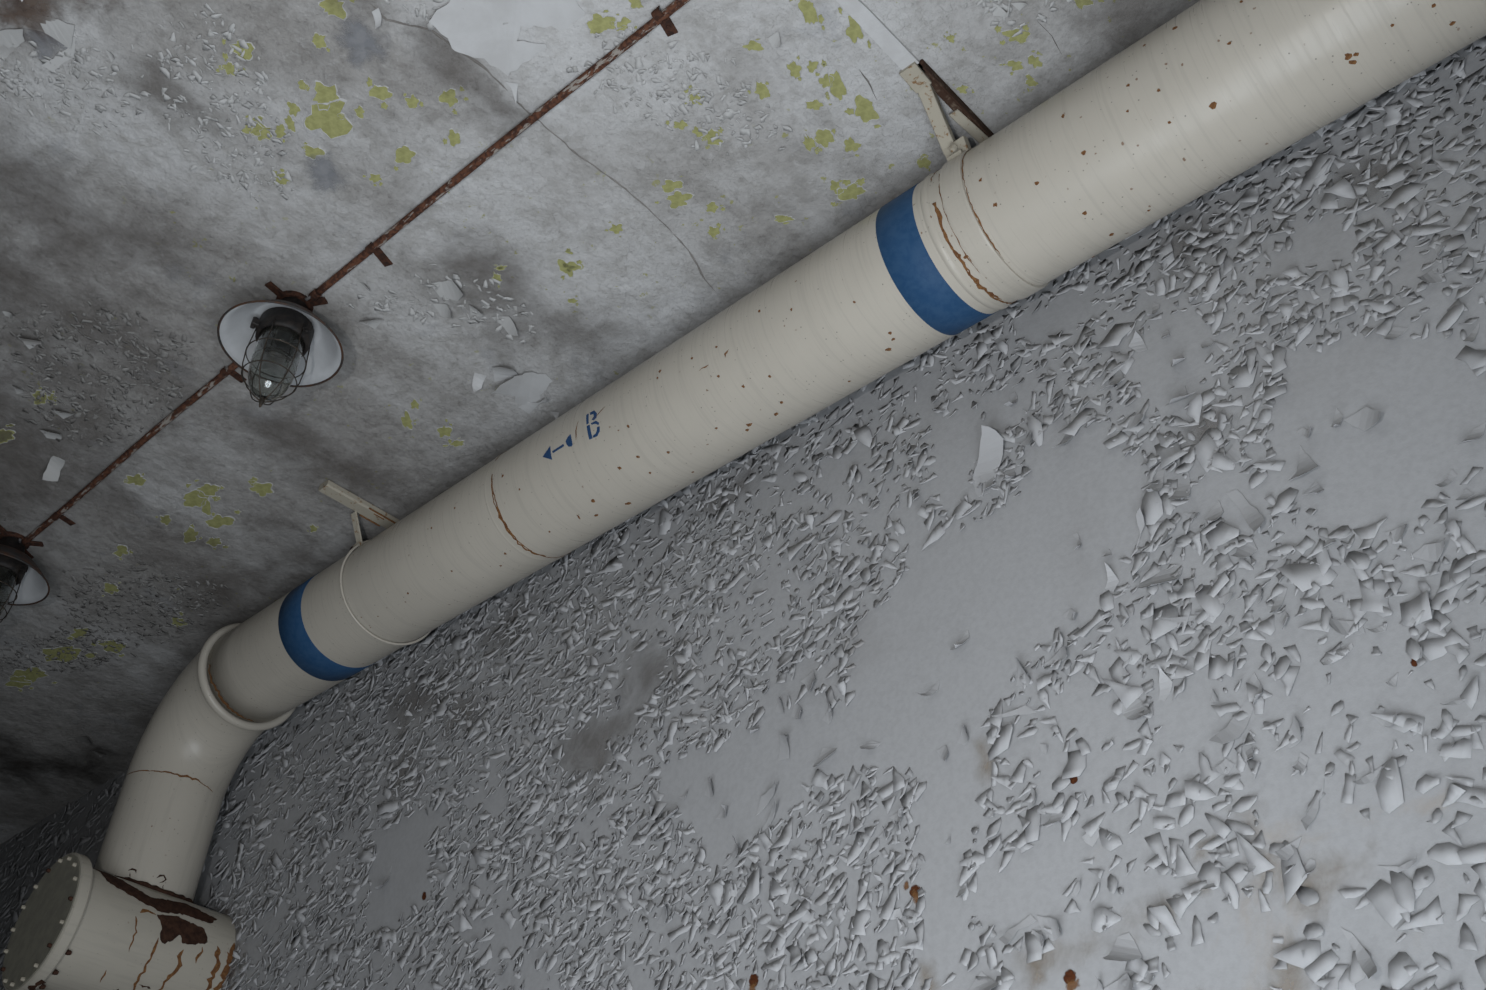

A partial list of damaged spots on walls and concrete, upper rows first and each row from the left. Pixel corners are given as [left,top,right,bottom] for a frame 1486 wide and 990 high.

corrosion [0,0,52,30]
peeling [0,0,469,202]
crack [371,4,715,291]
peeling [372,0,882,157]
peeling [0,297,195,481]
peeling [903,37,1486,952]
corrosion [749,974,758,990]
corrosion [904,882,920,904]
peeling [942,878,1080,990]
corrosion [1063,970,1079,990]
peeling [1095,933,1170,990]
peeling [1272,768,1486,990]